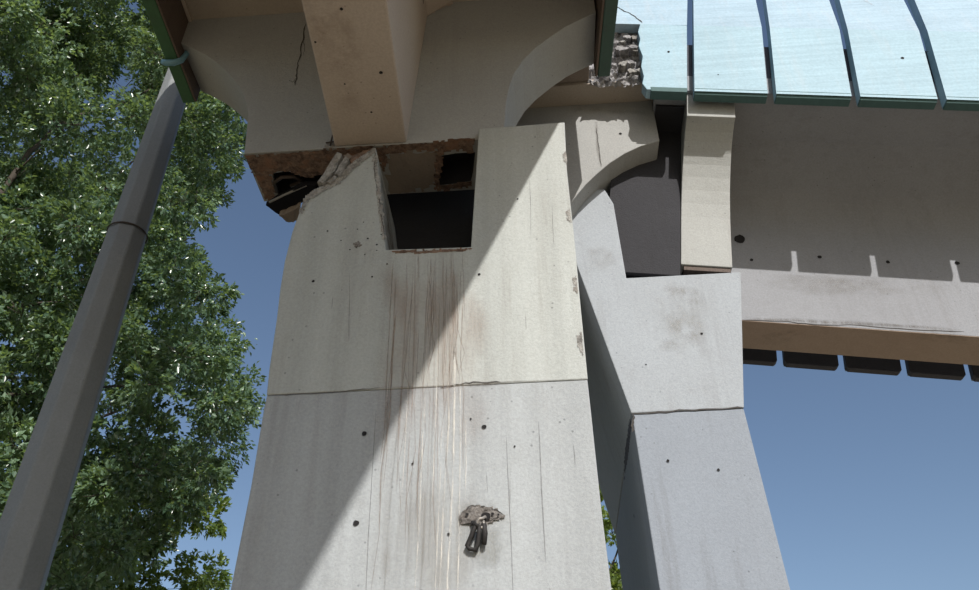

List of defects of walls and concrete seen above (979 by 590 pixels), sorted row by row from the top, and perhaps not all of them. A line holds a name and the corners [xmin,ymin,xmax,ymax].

crack [289,24,306,84]
spalling [588,32,642,88]
peeling [273,135,475,255]
crack [288,387,380,395]
crack [441,380,511,388]
crack [631,406,744,432]